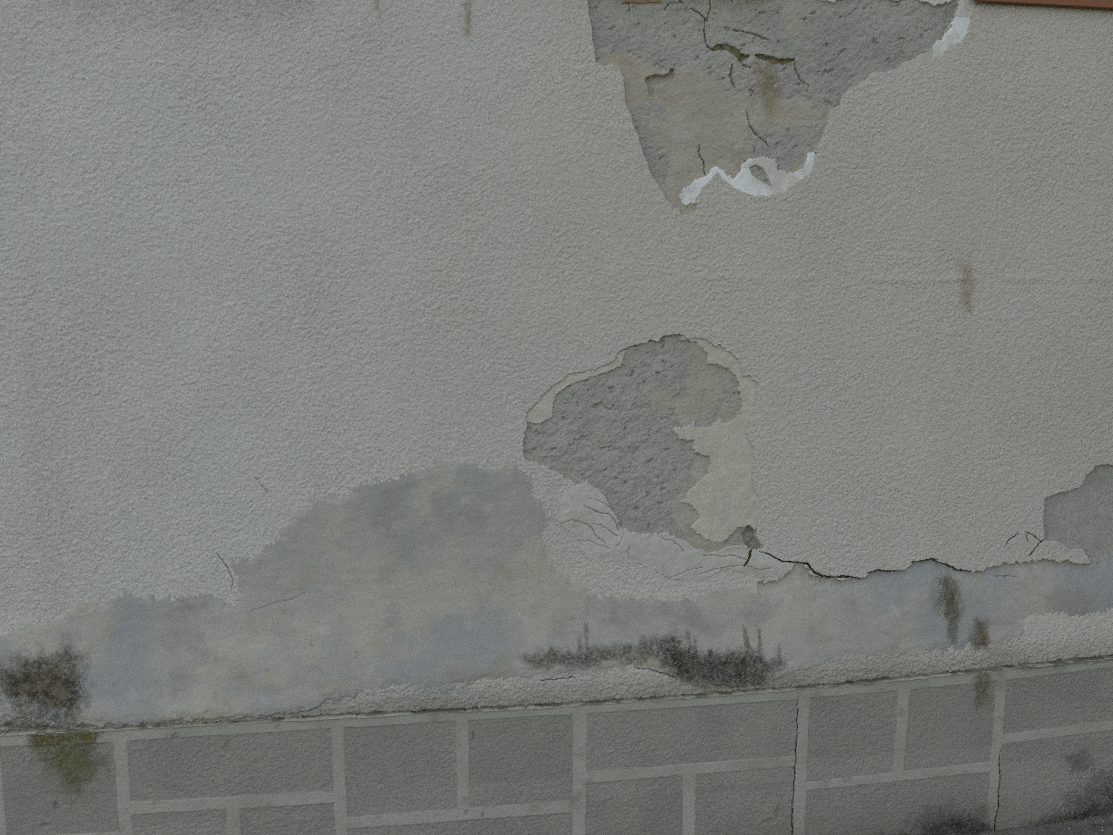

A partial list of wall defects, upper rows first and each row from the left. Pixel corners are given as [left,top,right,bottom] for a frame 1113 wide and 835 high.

spalling [588,0,973,214]
spalling [523,334,795,582]
crack [563,499,629,550]
crack [665,539,1009,579]
crack [1006,531,1044,555]
spalling [1043,465,1113,559]
damp [529,637,780,684]
damp [0,649,97,783]